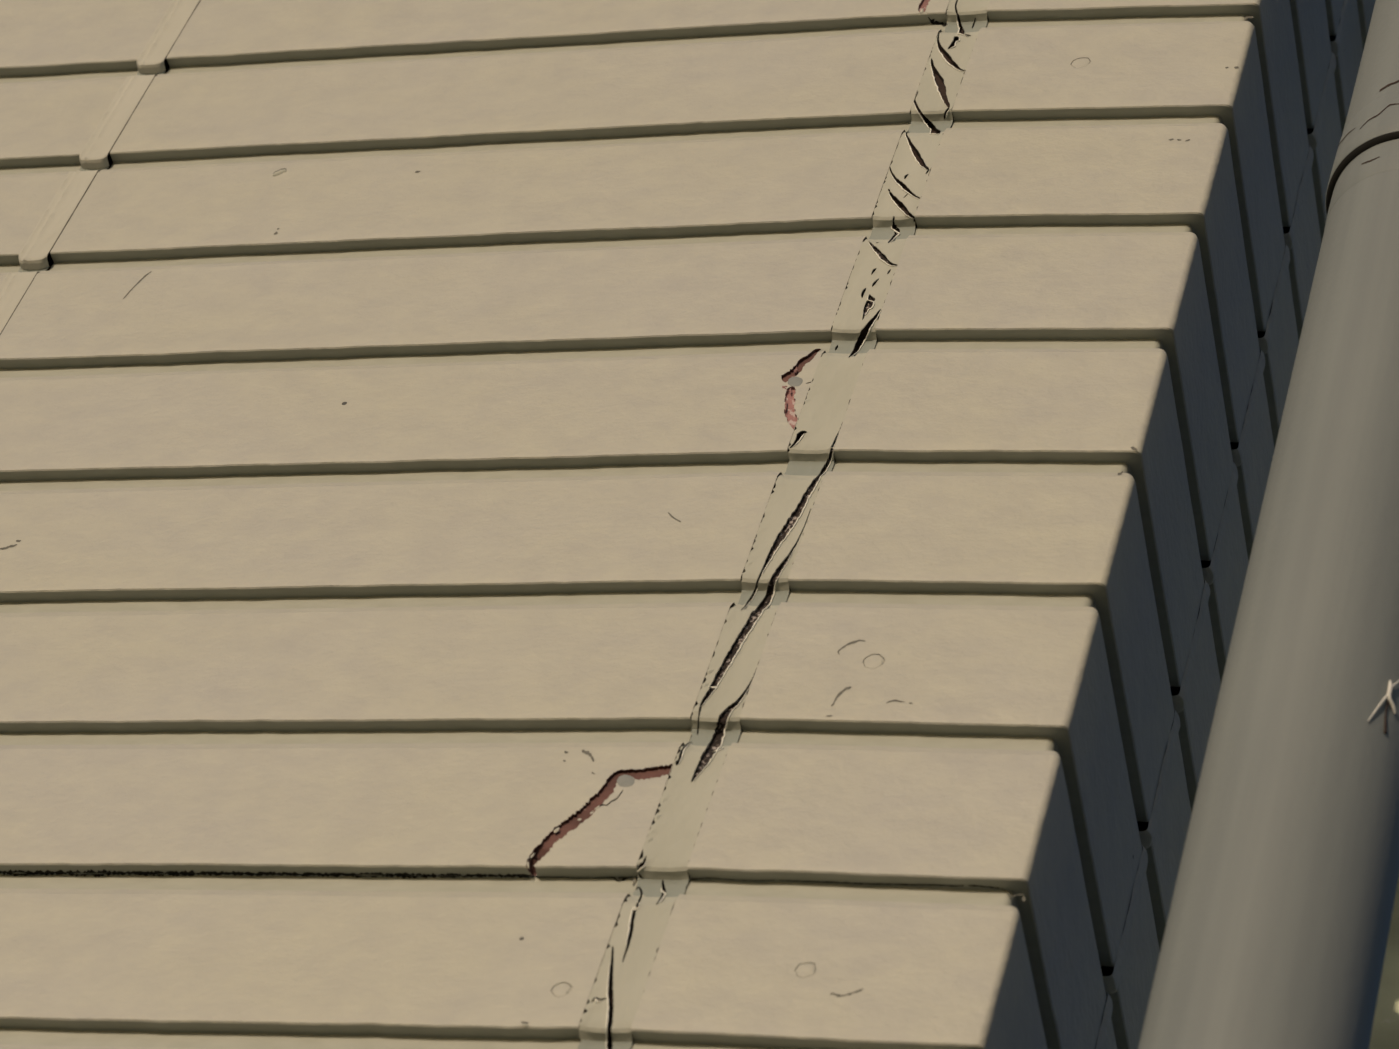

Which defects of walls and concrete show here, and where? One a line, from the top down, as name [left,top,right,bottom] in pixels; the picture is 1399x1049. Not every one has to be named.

crack [526,0,976,876]
crack [591,856,666,1049]